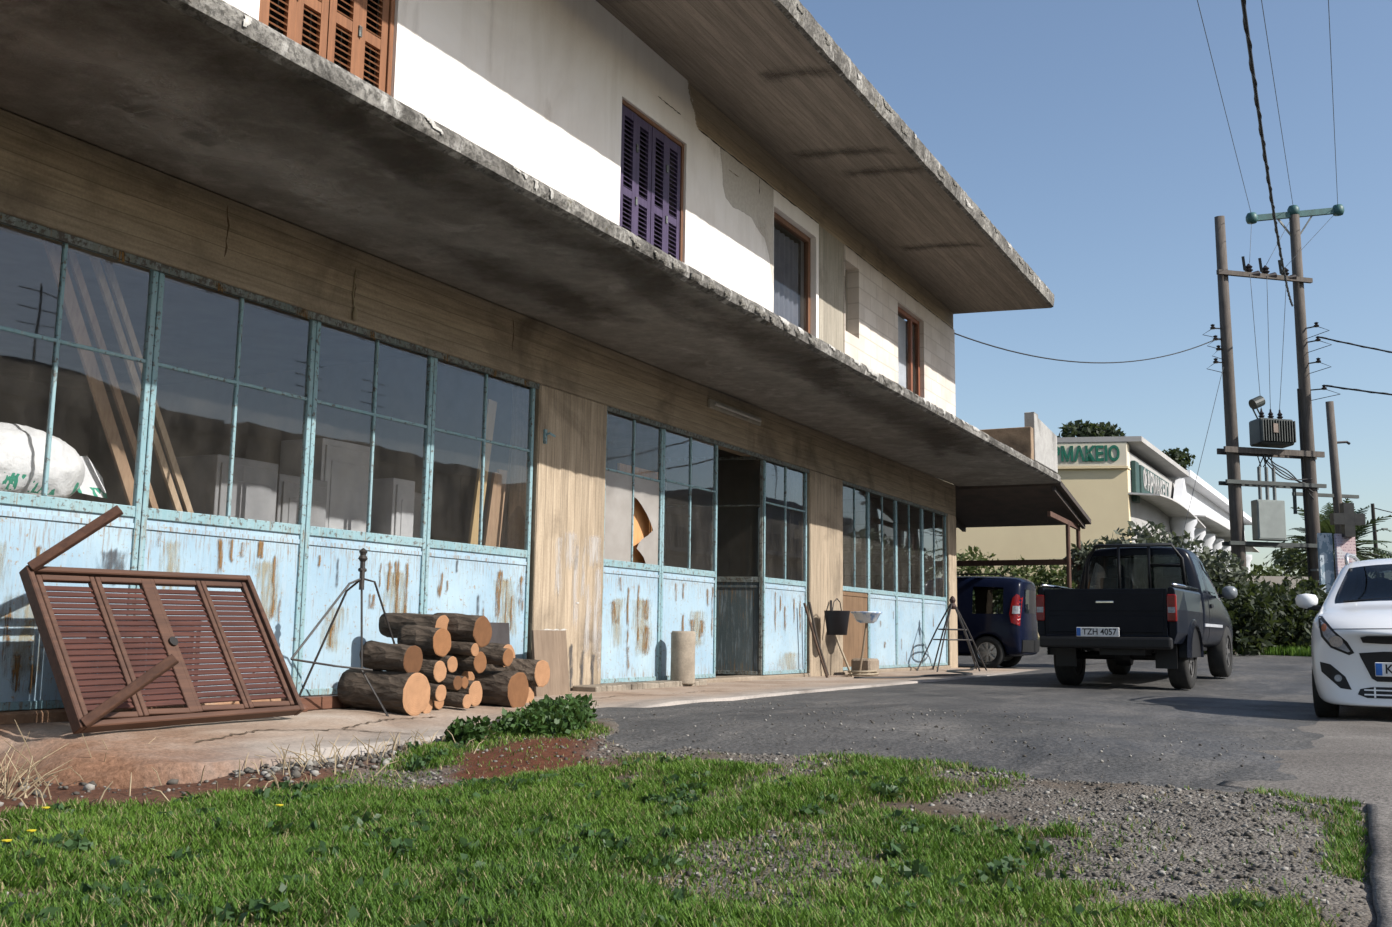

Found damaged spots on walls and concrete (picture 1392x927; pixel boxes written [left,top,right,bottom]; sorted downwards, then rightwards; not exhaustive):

peeling [720,148,774,283]
corrosion [2,598,36,693]
corrosion [217,539,280,620]
corrosion [369,562,409,613]
corrosion [483,570,524,631]
corrosion [610,579,650,670]
corrosion [681,587,714,641]
crack [196,716,433,742]